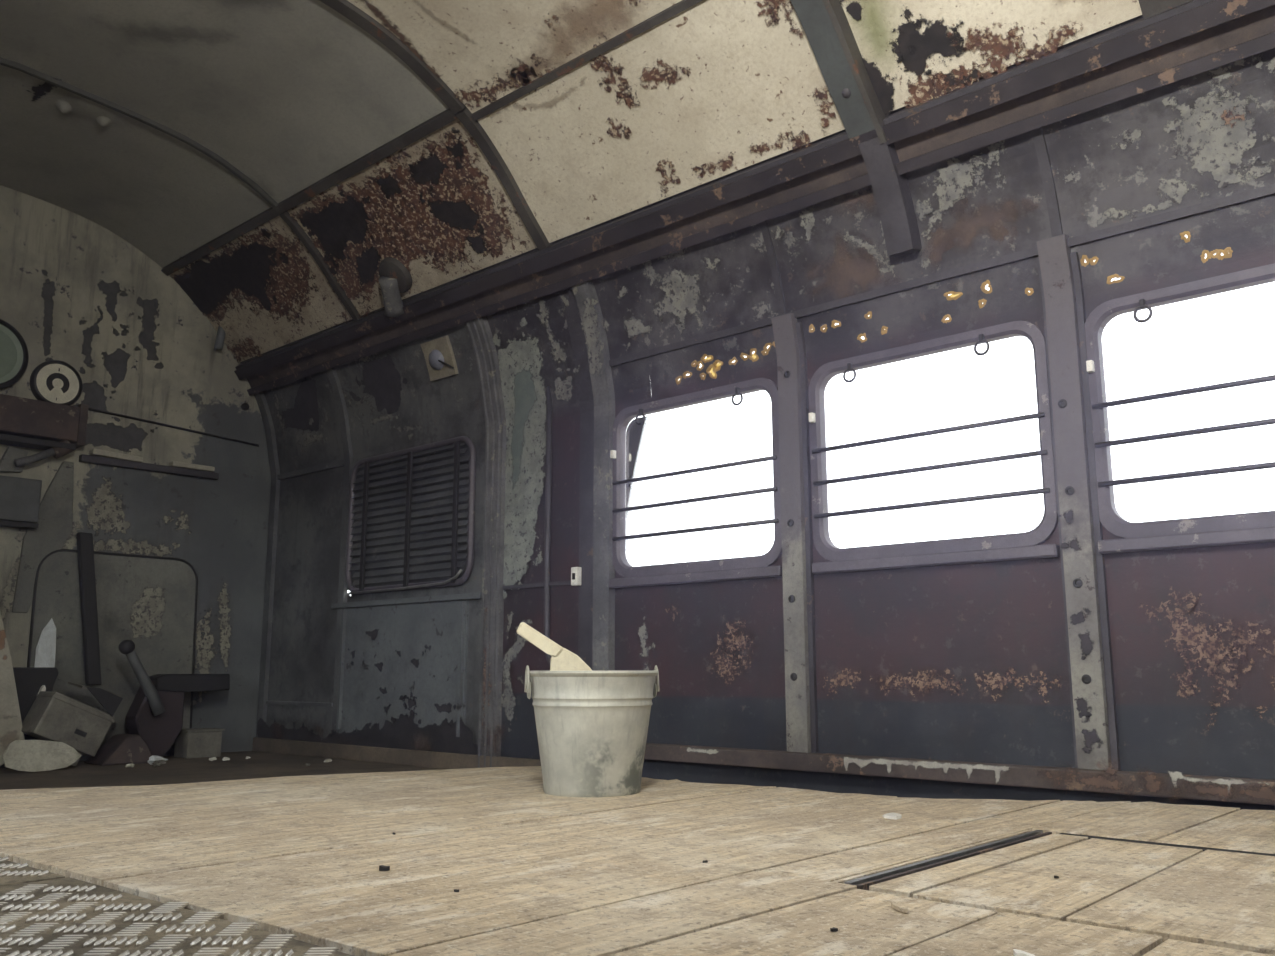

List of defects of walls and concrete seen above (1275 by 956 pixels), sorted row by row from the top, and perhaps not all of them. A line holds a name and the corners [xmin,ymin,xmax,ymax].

rust [170,127,526,327]
rust [544,0,692,141]
rust [656,152,734,197]
rust [757,0,804,38]
rust [750,88,836,158]
peeling [915,143,1005,268]
rust [901,22,1083,108]
peeling [1097,53,1275,225]
peeling [73,280,164,452]
peeling [492,248,720,732]
peeling [257,688,477,755]
peeling [1076,698,1102,753]